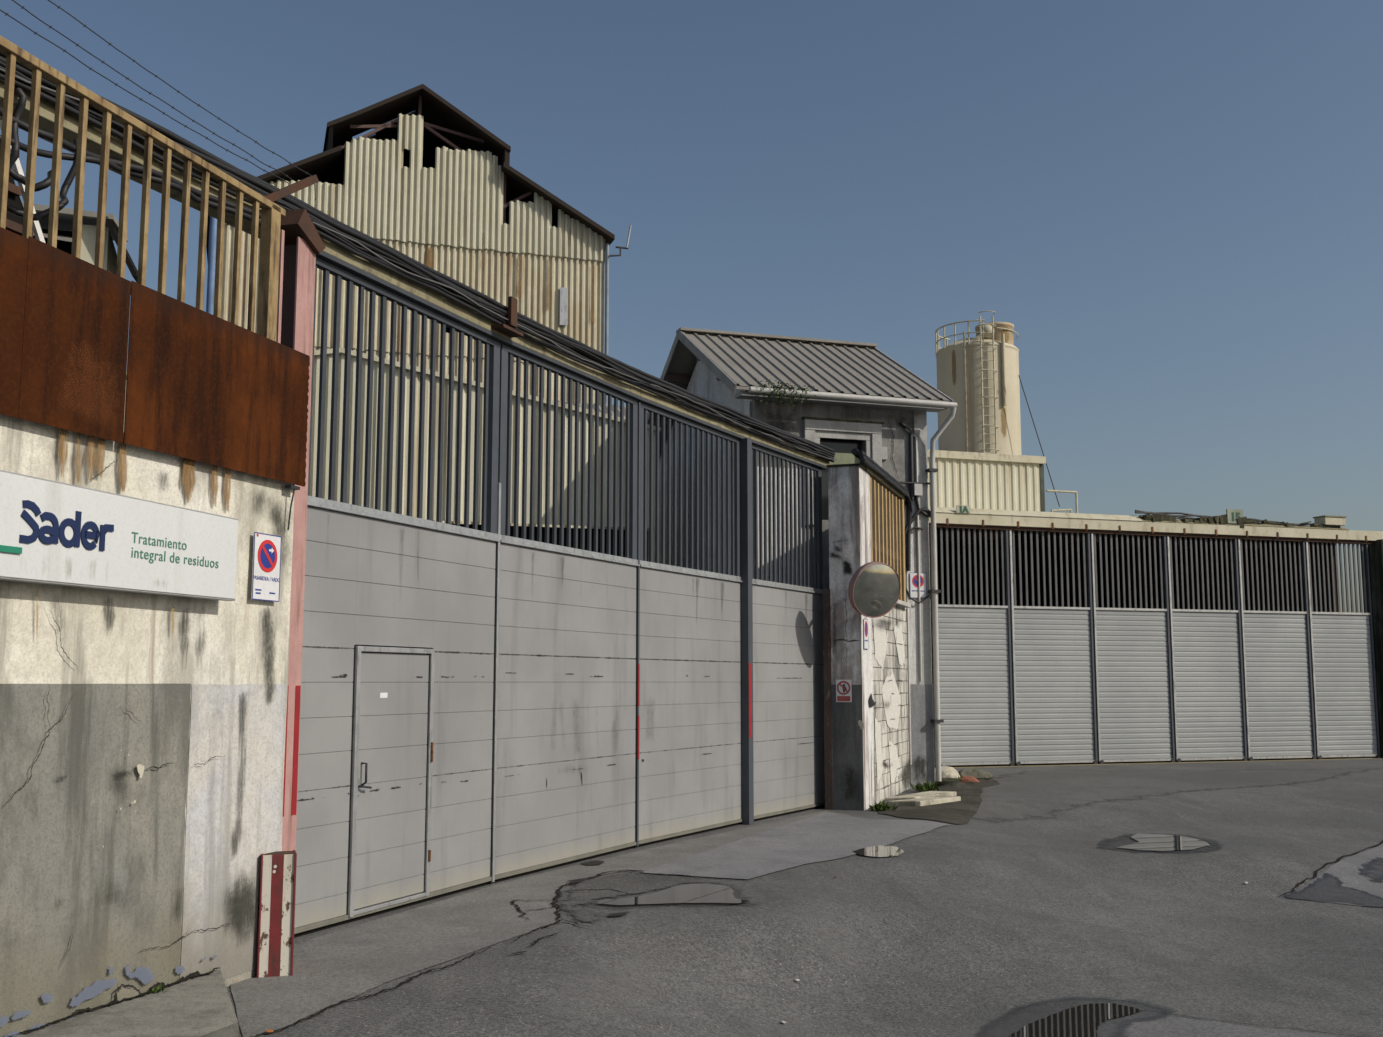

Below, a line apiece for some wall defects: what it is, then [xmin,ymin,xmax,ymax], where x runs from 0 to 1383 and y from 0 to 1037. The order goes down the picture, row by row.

rust [0,227,310,511]
crack [3,612,78,807]
leakage [234,693,246,855]
leakage [265,608,275,703]
leakage [228,877,259,937]
peeling [69,964,154,1019]